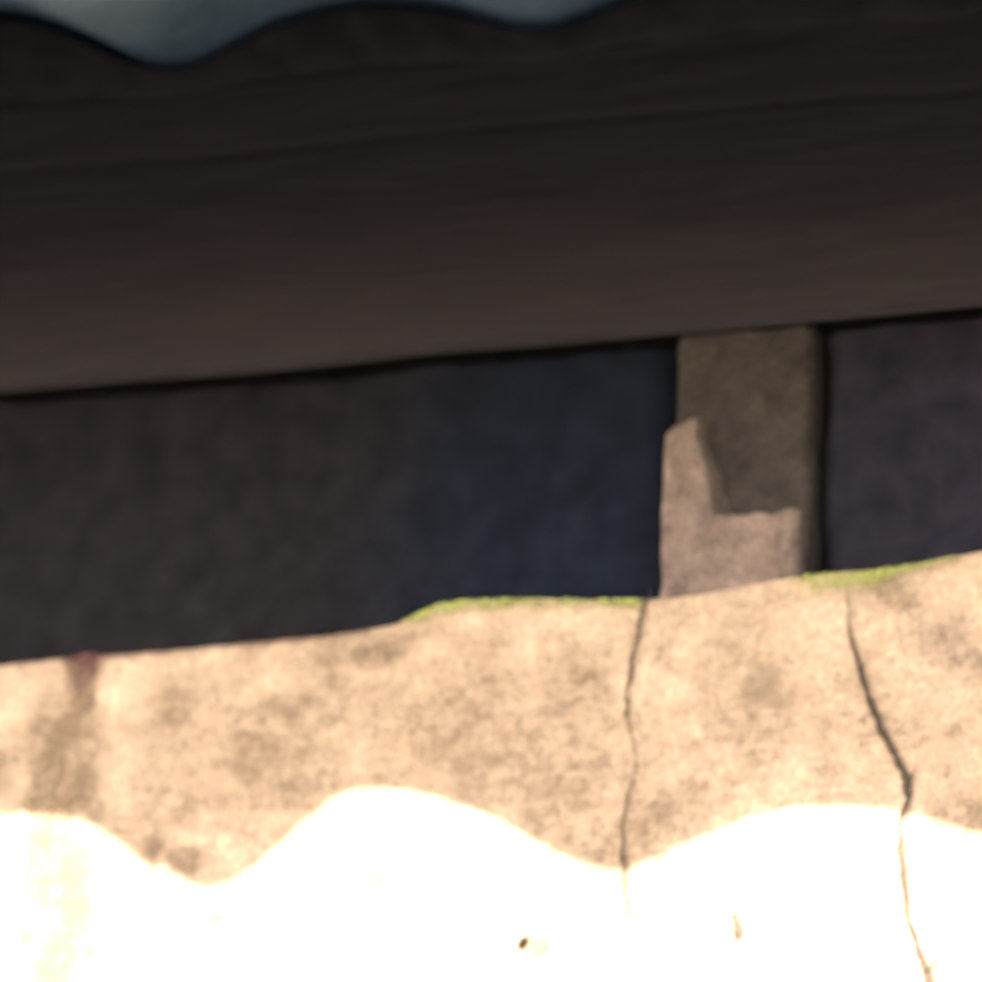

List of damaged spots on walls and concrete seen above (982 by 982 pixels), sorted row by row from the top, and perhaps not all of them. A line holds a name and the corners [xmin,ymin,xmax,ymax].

damp [18,654,100,982]
crack [621,771,637,982]
crack [626,590,651,736]
crack [847,593,945,982]